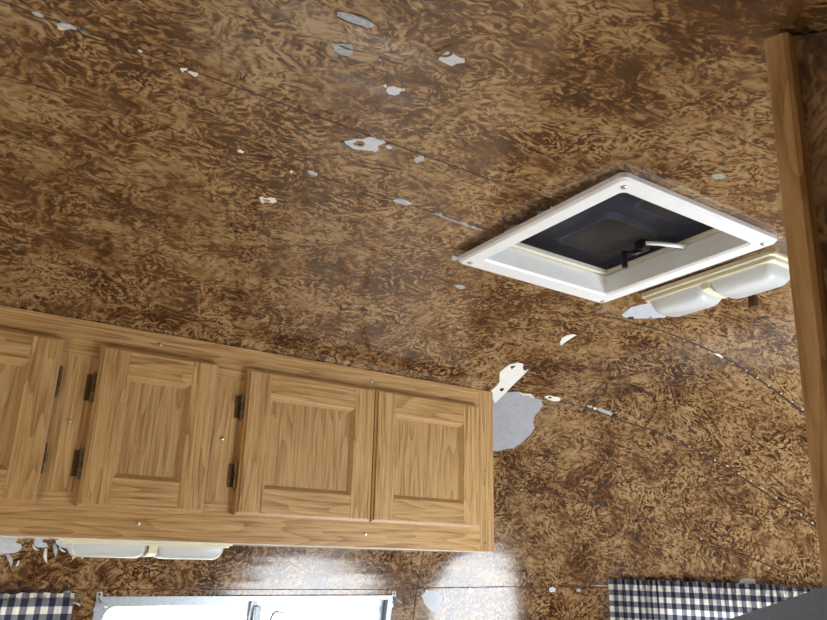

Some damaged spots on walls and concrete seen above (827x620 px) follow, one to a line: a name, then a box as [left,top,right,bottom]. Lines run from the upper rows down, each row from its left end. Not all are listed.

peeling [57,22,90,34]
peeling [434,51,465,66]
peeling [383,84,405,95]
peeling [341,136,393,152]
peeling [622,303,666,320]
peeling [491,363,560,451]
peeling [0,539,22,567]
peeling [32,540,84,563]
peeling [422,589,442,616]